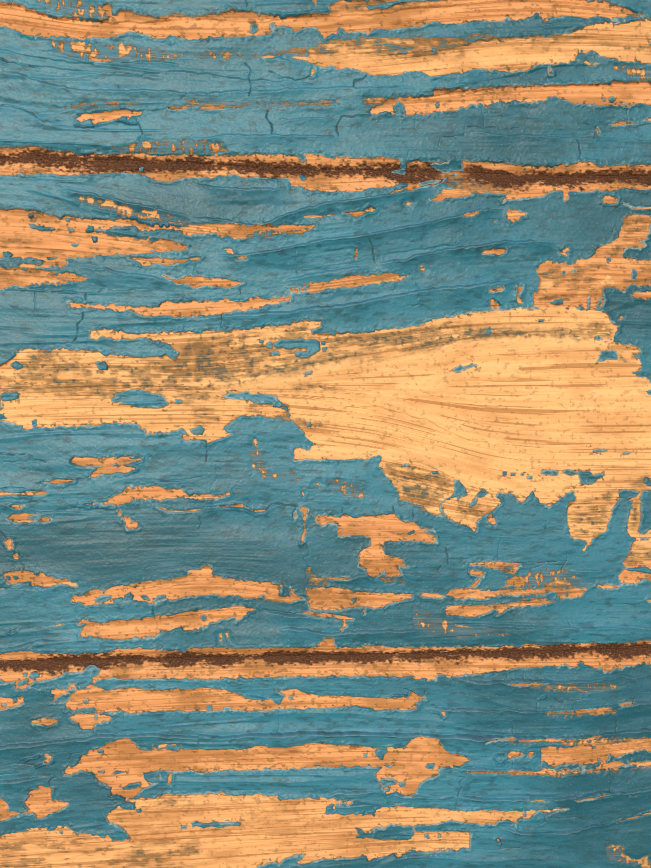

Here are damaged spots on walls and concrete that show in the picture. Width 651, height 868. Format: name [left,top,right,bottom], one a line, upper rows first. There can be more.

peeling [47,100,144,124]
peeling [0,0,651,117]
peeling [0,138,651,730]
peeling [0,736,651,868]